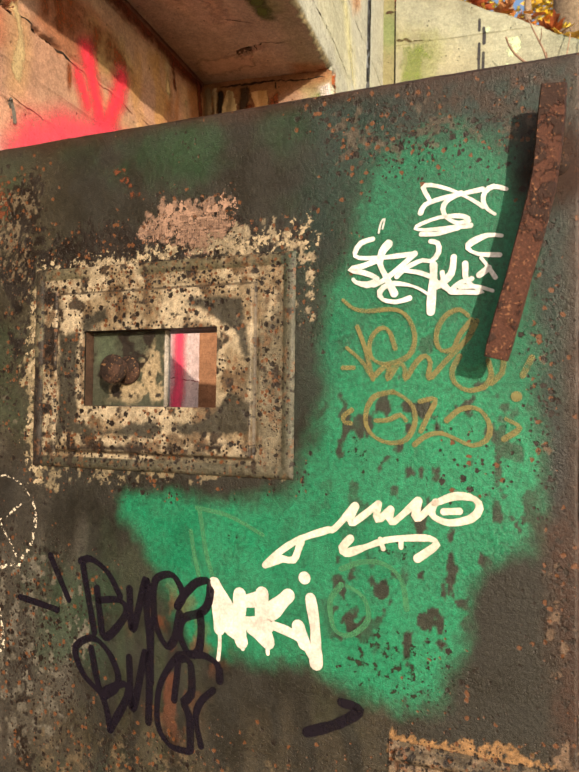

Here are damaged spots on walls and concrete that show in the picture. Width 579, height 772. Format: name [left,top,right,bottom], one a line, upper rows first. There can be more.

crack [13,10,147,124]
corrosion [522,149,534,183]
peeling [70,192,321,268]
peeling [19,287,43,486]